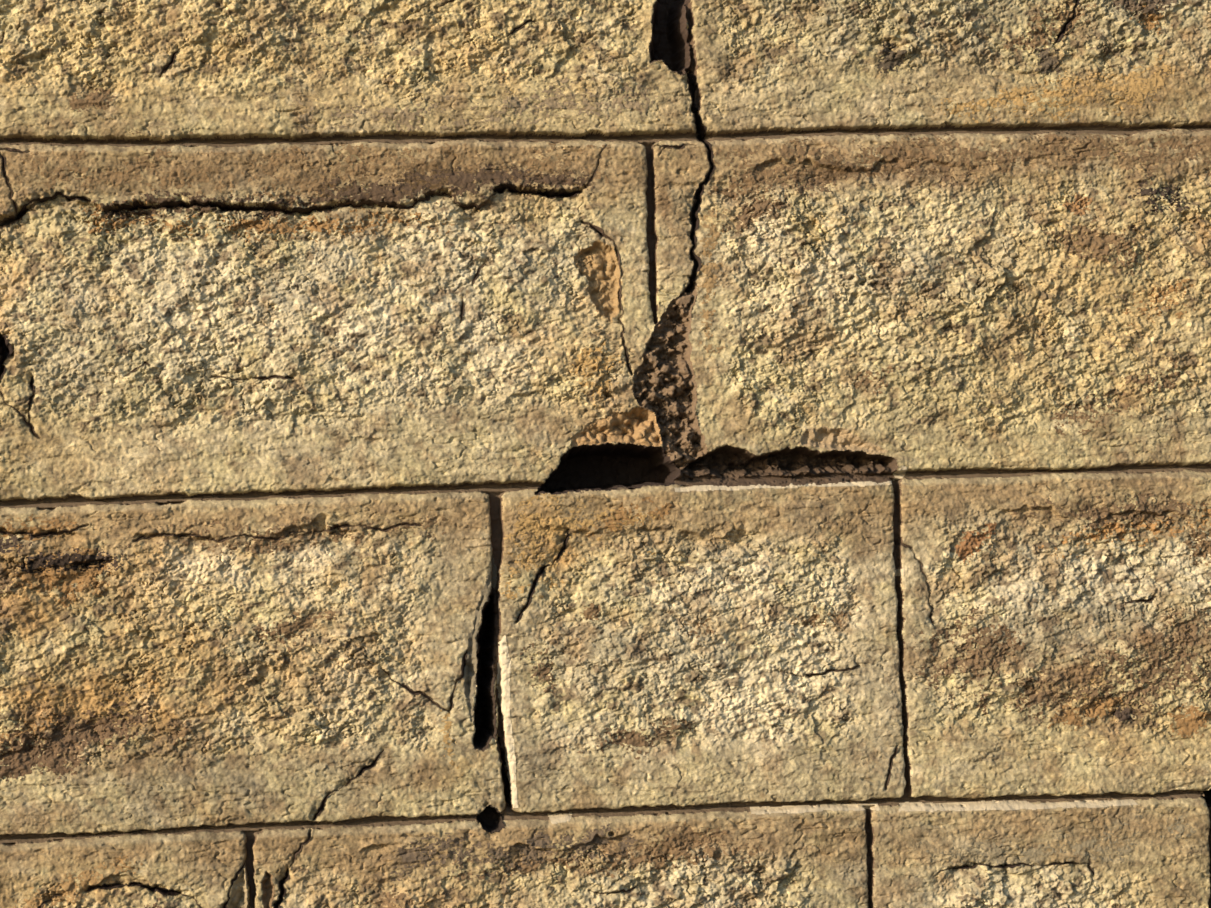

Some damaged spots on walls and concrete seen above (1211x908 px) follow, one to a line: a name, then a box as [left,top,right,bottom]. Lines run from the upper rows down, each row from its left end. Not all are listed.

crack [655,73,715,290]
crack [0,145,632,374]
crack [0,335,38,437]
crack [212,374,291,382]
peeling [534,281,899,495]
crack [136,522,420,542]
crack [517,530,569,622]
crack [382,652,467,711]
crack [497,740,511,805]
crack [274,750,384,908]
crack [39,863,245,908]